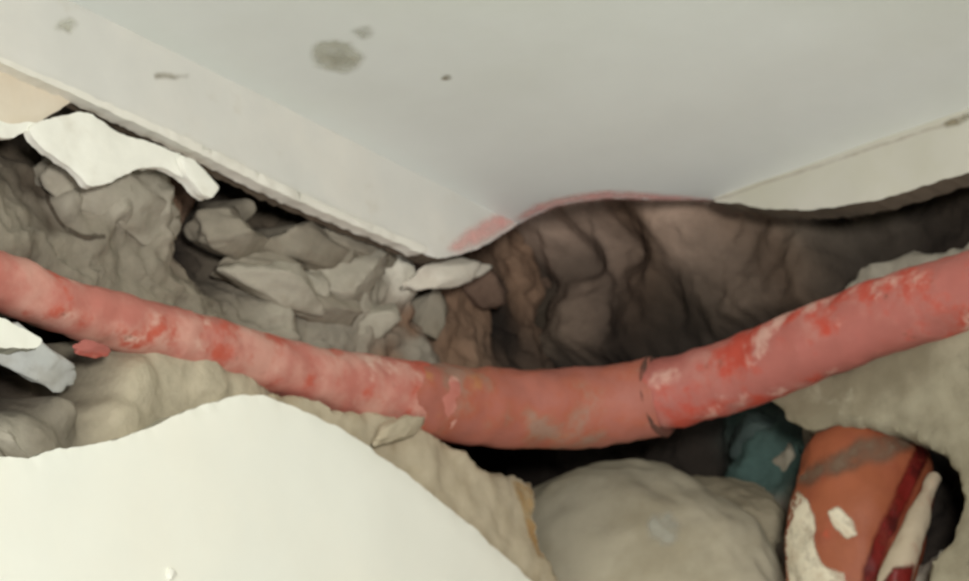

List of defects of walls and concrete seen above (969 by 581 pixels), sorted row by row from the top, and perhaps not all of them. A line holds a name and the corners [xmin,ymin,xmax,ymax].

leakage [317,42,360,70]
flaking render [0,106,969,370]
flaking render [0,341,272,458]
peeling [506,331,969,581]